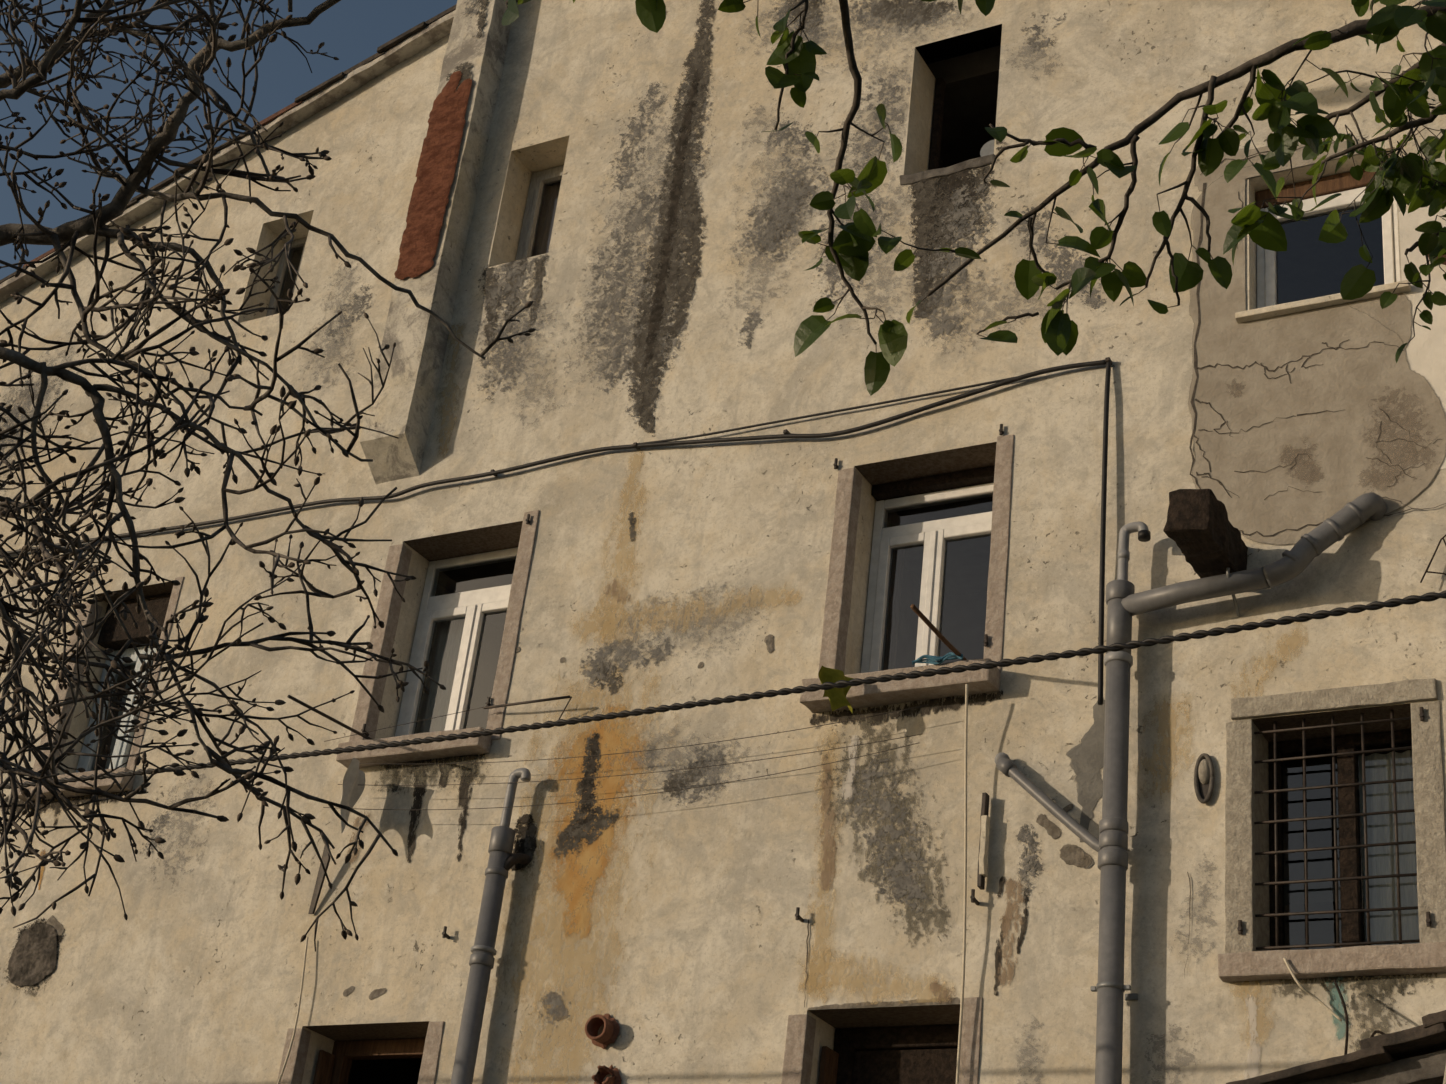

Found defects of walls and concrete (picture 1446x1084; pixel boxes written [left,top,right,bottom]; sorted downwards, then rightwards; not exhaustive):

flaking render [394,62,472,280]
water stain [475,251,551,401]
water stain [580,0,716,433]
water stain [736,117,893,308]
water stain [909,140,1107,344]
crack [1189,155,1404,537]
crack [1366,408,1446,516]
water stain [576,634,676,695]
water stain [374,754,488,863]
water stain [642,740,732,806]
water stain [809,690,1003,946]
flaking render [5,915,65,995]